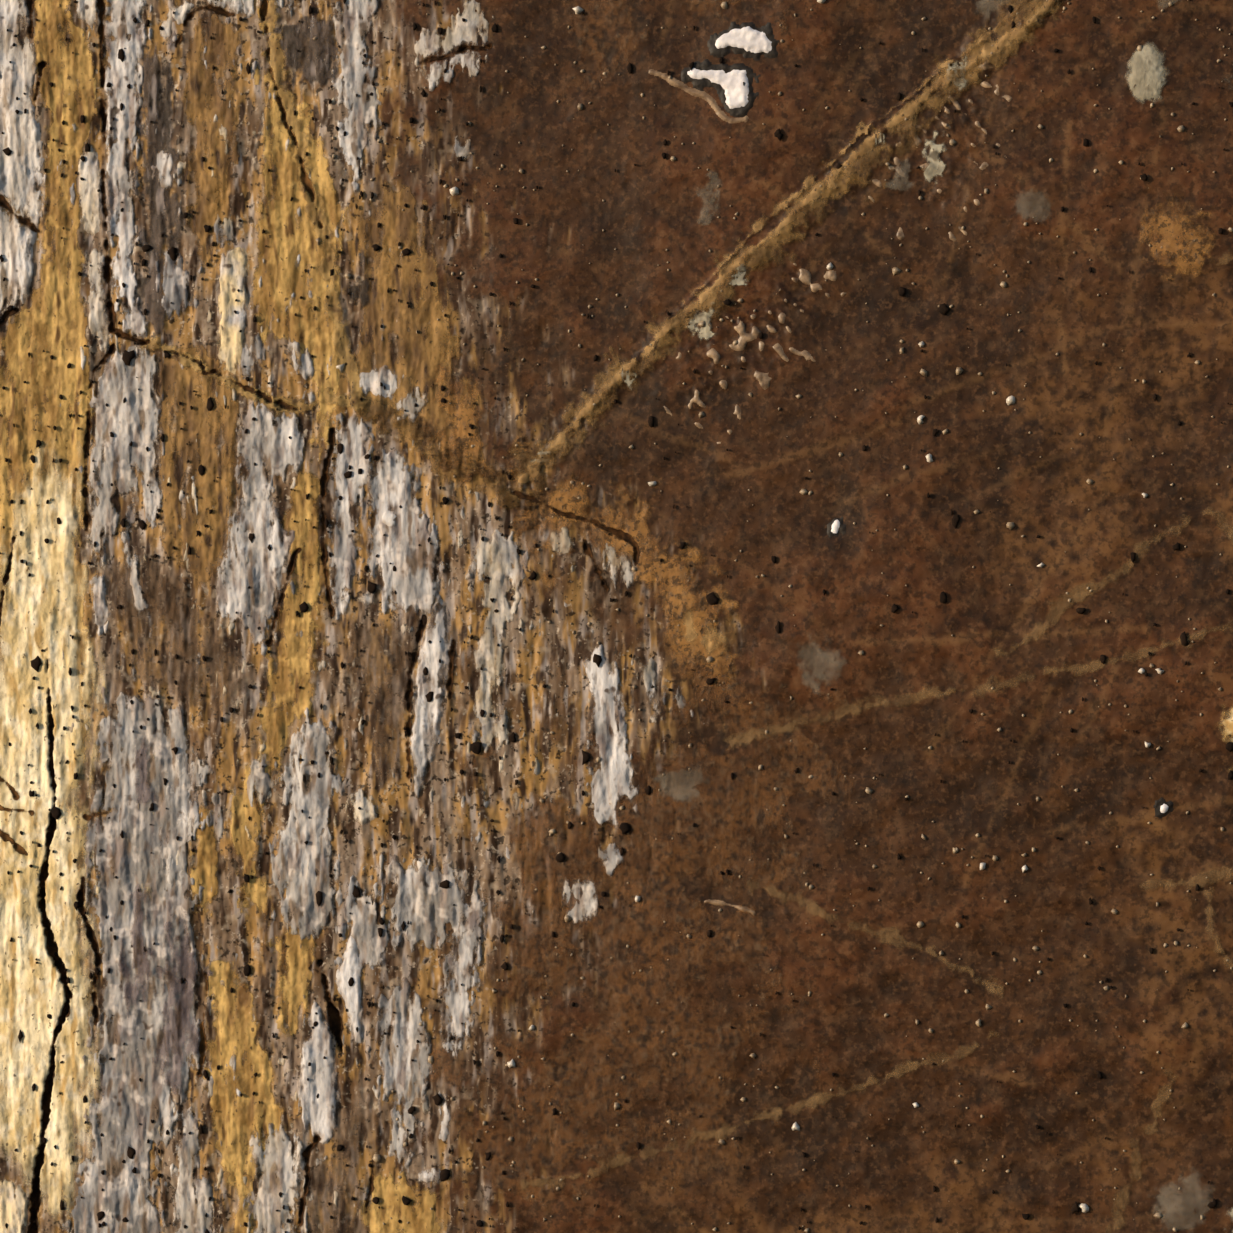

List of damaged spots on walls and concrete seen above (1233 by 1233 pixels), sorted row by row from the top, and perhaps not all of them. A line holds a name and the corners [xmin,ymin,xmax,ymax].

rust [562,0,649,90]
crack [0,195,39,233]
crack [265,427,335,647]
crack [513,491,640,592]
peeling [563,644,704,924]
crack [0,659,108,1233]
peeling [42,680,227,1233]
rust [416,1036,464,1091]
rust [447,664,853,1201]